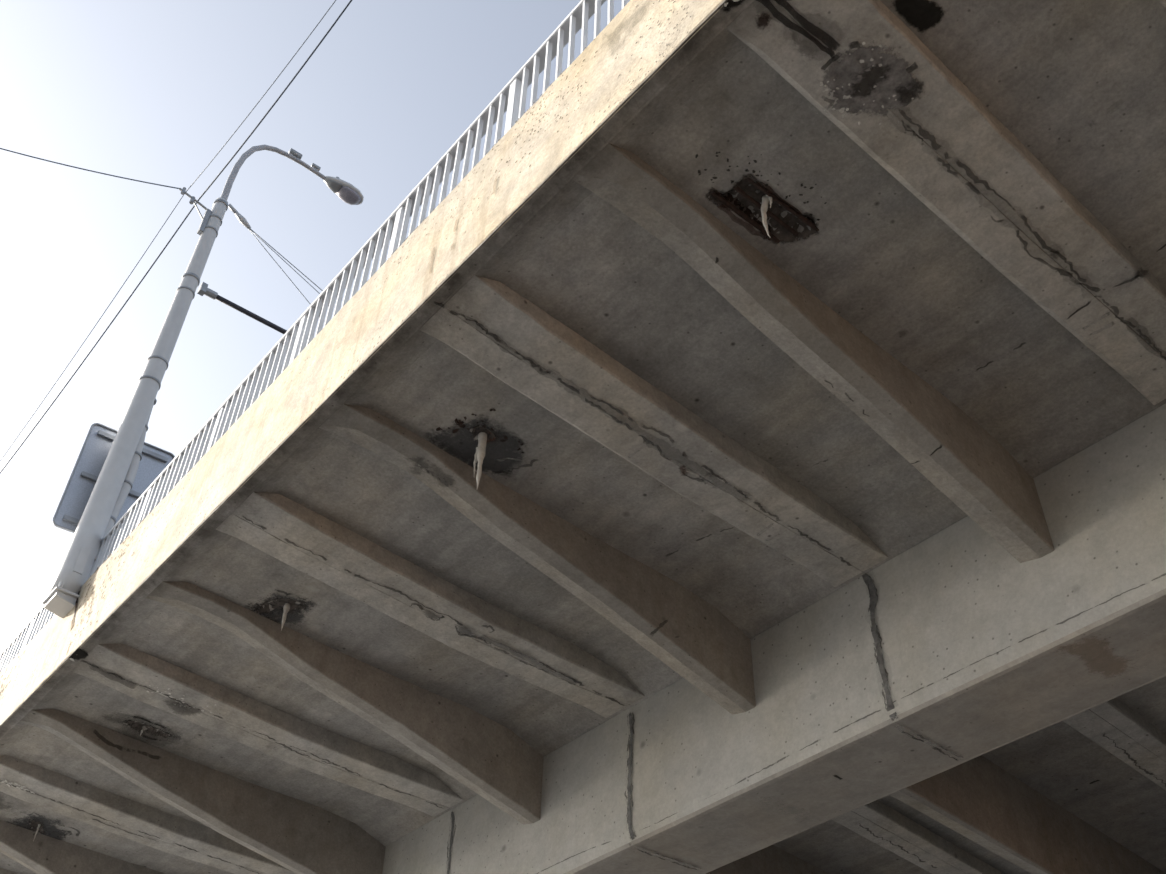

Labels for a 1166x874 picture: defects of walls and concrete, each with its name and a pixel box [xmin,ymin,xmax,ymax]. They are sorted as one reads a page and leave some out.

damp [894,0,944,32]
spalling [695,152,827,244]
crack [1116,244,1166,287]
spalling [426,409,524,475]
crack [435,302,1166,796]
spalling [248,594,313,624]
spalling [125,716,172,740]
crack [66,591,454,874]
crack [243,516,697,874]
crack [1,780,259,874]